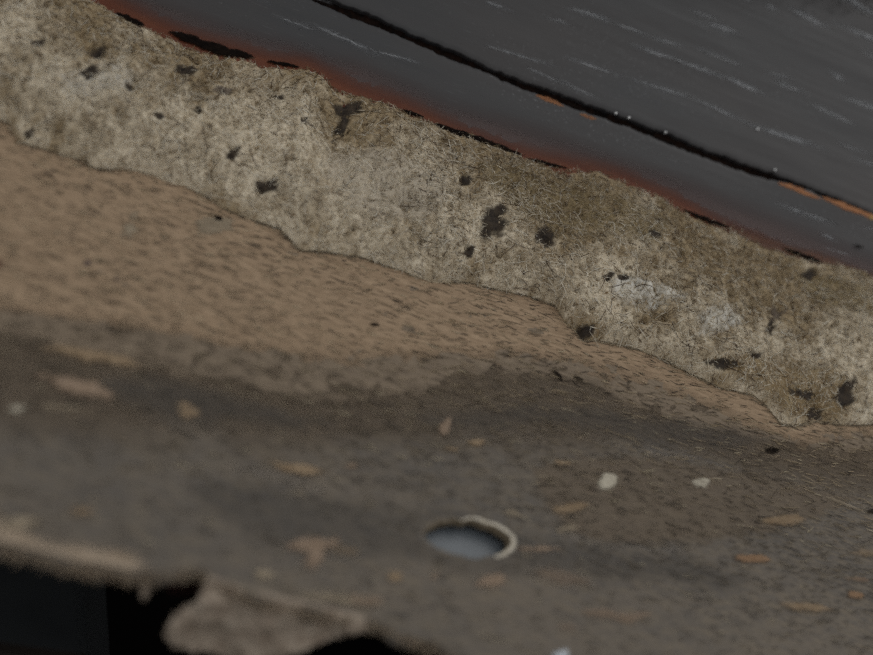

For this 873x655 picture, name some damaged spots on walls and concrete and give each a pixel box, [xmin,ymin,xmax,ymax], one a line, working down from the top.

crack [116,13,144,26]
spalling [79,46,105,80]
spalling [176,65,197,76]
crack [169,31,299,68]
crack [313,0,824,197]
spalling [333,101,363,136]
crack [684,209,730,228]
crack [784,248,823,263]
peeling [0,121,873,481]
peeling [599,473,617,489]